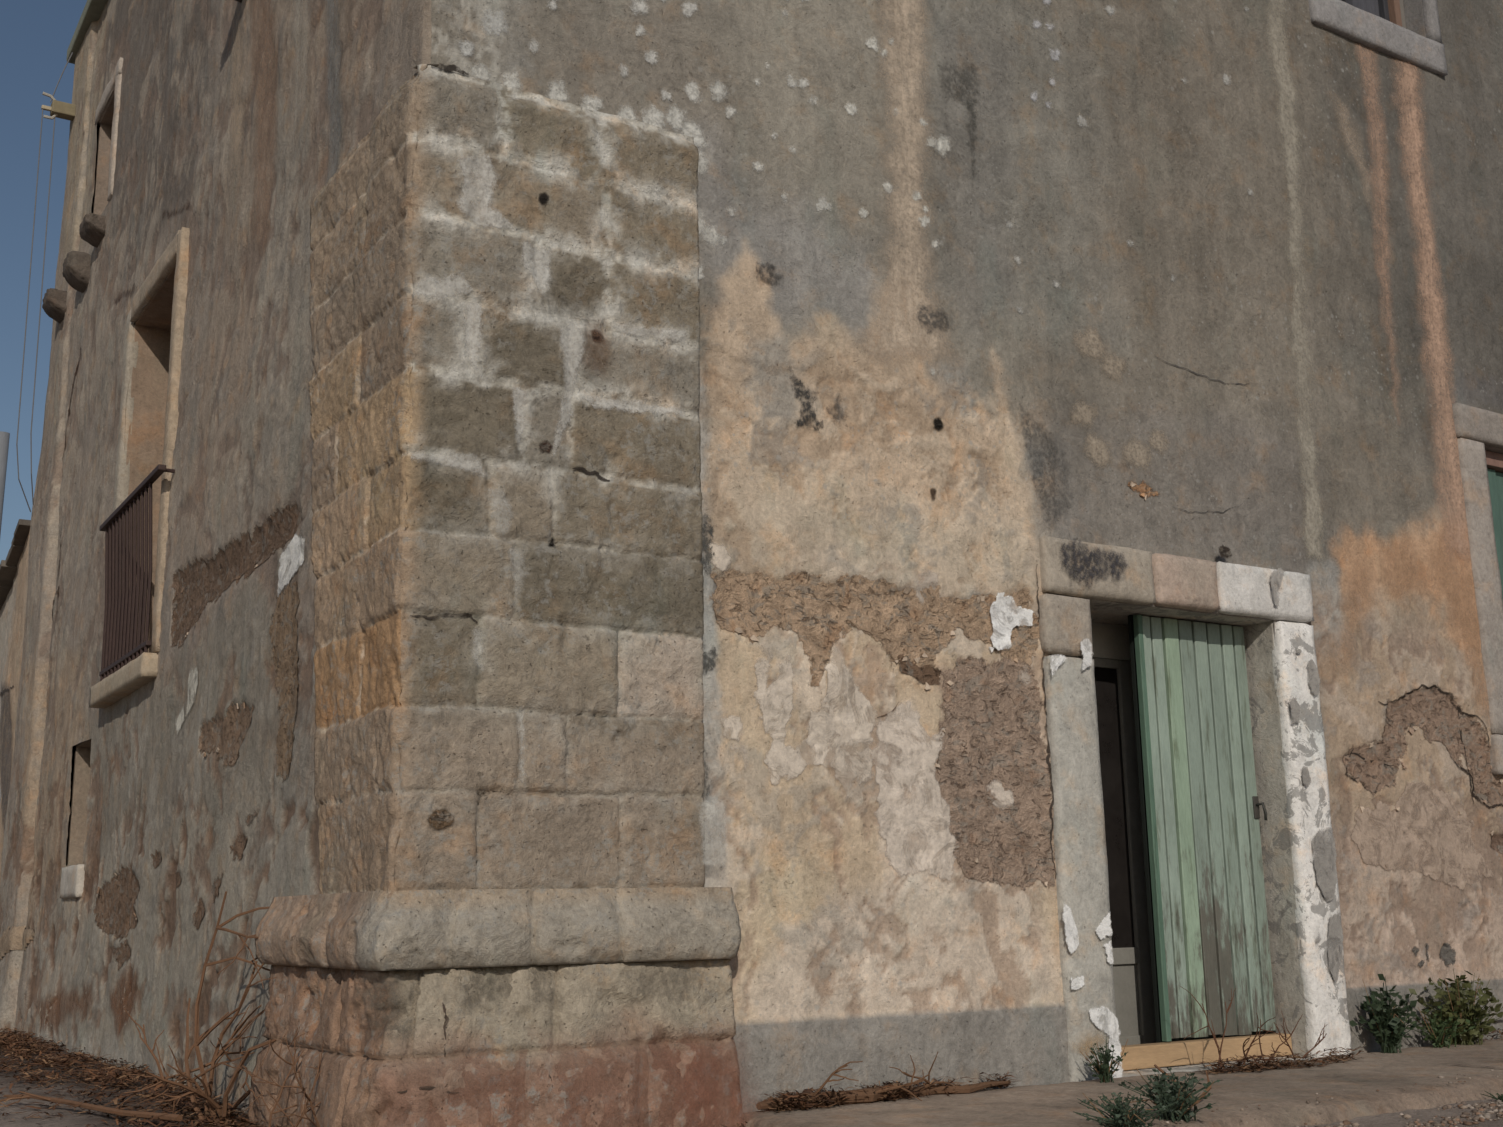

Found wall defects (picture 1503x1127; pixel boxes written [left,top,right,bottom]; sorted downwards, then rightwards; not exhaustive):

leakage [864,0,949,358]
corrosion [1359,44,1389,300]
corrosion [1399,61,1470,557]
spalling [93,864,140,970]
spalling [192,811,257,929]
spalling [171,502,305,782]
spalling [709,543,1093,891]
peeling [1062,904,1114,964]
leakage [1060,540,1127,585]
peeling [1089,1006,1123,1078]
peeling [1289,649,1321,724]
peeling [1312,685,1503,982]